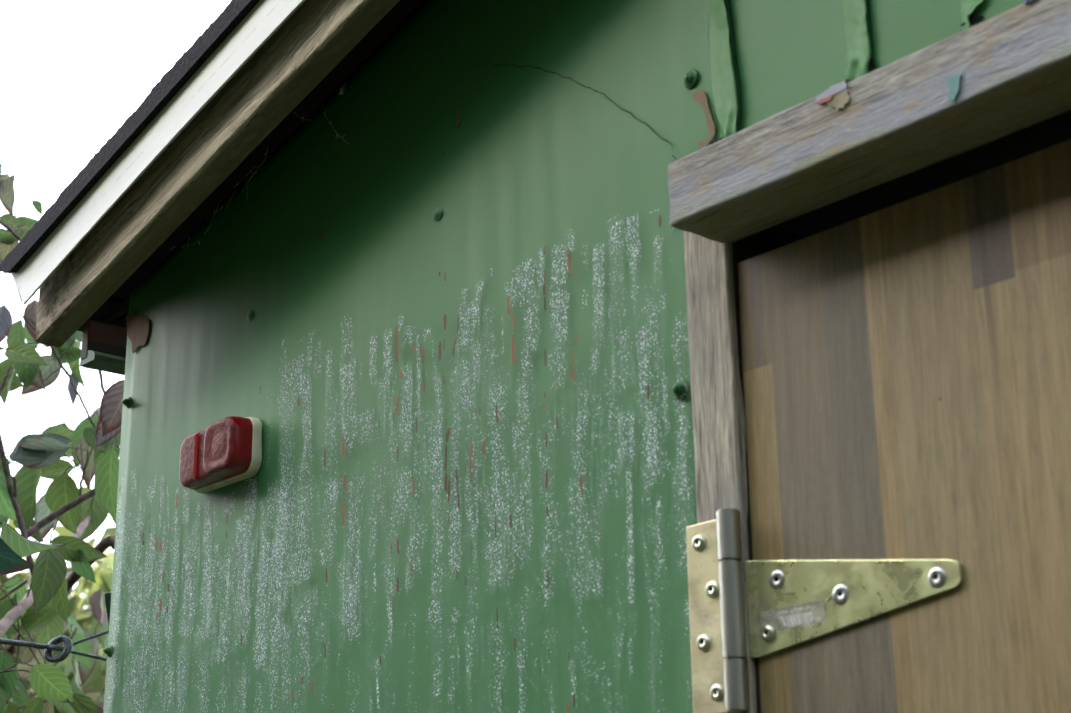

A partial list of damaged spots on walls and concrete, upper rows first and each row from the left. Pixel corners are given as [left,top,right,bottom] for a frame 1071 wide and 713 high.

crack [445,63,678,160]
peeling [692,90,716,148]
water stain [103,215,695,713]